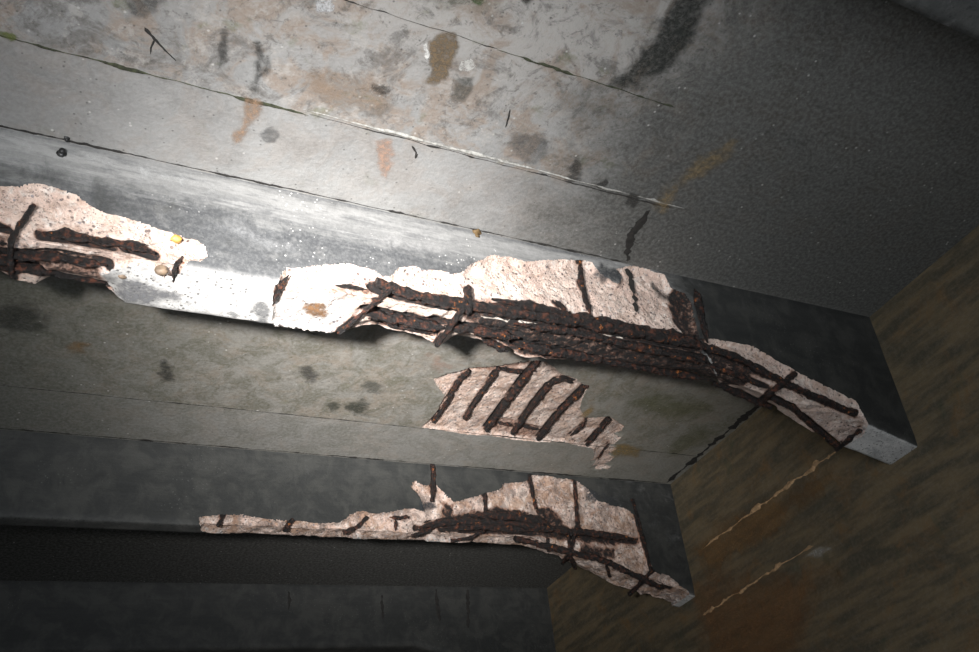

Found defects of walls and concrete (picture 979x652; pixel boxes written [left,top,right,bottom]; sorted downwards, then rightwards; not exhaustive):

spalling [0,183,208,296]
spalling [271,255,868,470]
spalling [199,464,689,606]